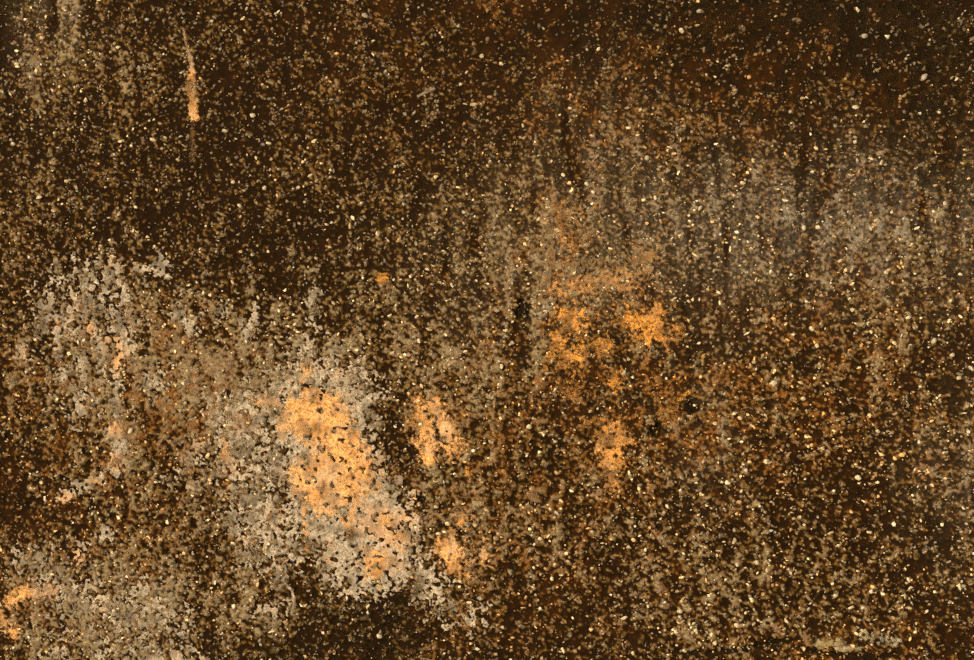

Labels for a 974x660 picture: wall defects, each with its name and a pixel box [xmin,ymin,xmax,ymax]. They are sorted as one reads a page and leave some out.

corrosion [182,28,199,121]
corrosion [534,189,685,395]
corrosion [219,438,235,472]
corrosion [247,359,385,551]
corrosion [404,392,468,468]
corrosion [594,415,637,494]
corrosion [356,512,408,590]